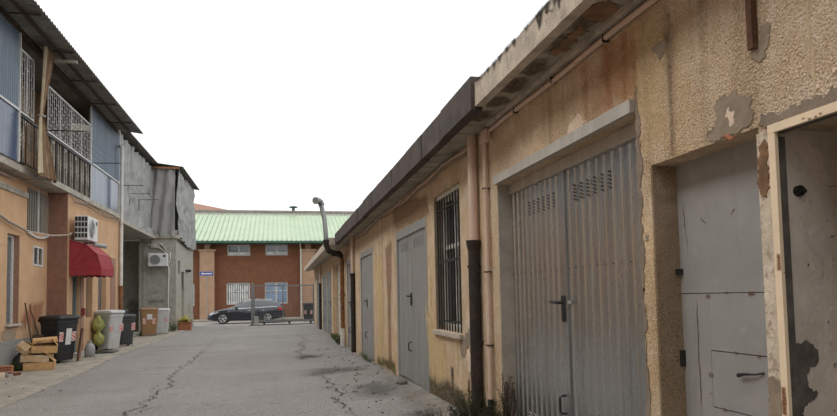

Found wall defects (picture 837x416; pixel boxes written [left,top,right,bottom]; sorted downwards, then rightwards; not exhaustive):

damp [524,0,560,29]
flaking render [750,22,771,63]
peeling [567,112,588,134]
flaking render [708,89,771,143]
flaking render [757,139,770,198]
flaking render [796,340,819,416]